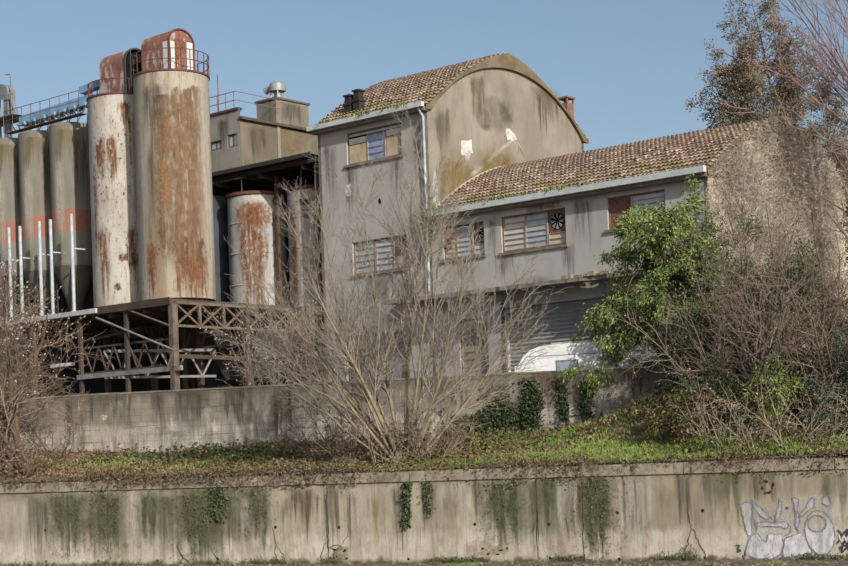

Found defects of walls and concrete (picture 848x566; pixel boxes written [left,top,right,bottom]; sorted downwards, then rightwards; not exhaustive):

rust [94,103,131,292]
rust [119,84,205,297]
rust [237,202,271,304]
crack [320,487,349,563]
crack [684,491,707,560]